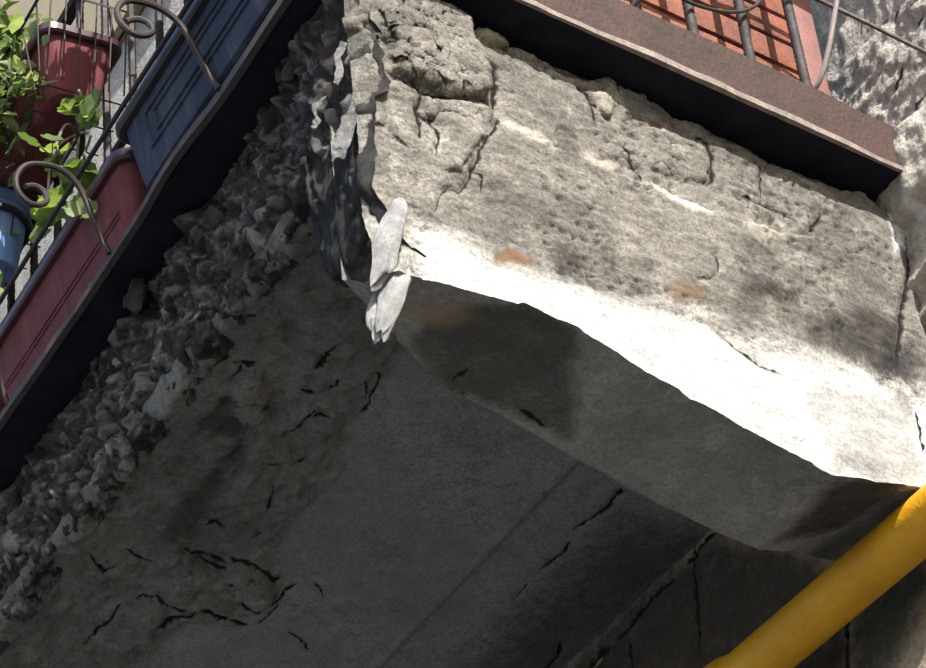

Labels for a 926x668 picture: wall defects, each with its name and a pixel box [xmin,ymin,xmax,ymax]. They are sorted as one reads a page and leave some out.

crack [367,72,451,155]
crack [436,61,501,209]
crack [577,87,597,125]
crack [622,146,642,181]
crack [695,137,715,185]
crack [740,165,797,222]
water stain [900,187,926,222]
rust [497,252,528,263]
spalling [0,0,427,623]
crack [721,338,781,375]
water stain [809,311,917,384]
crack [83,548,323,645]